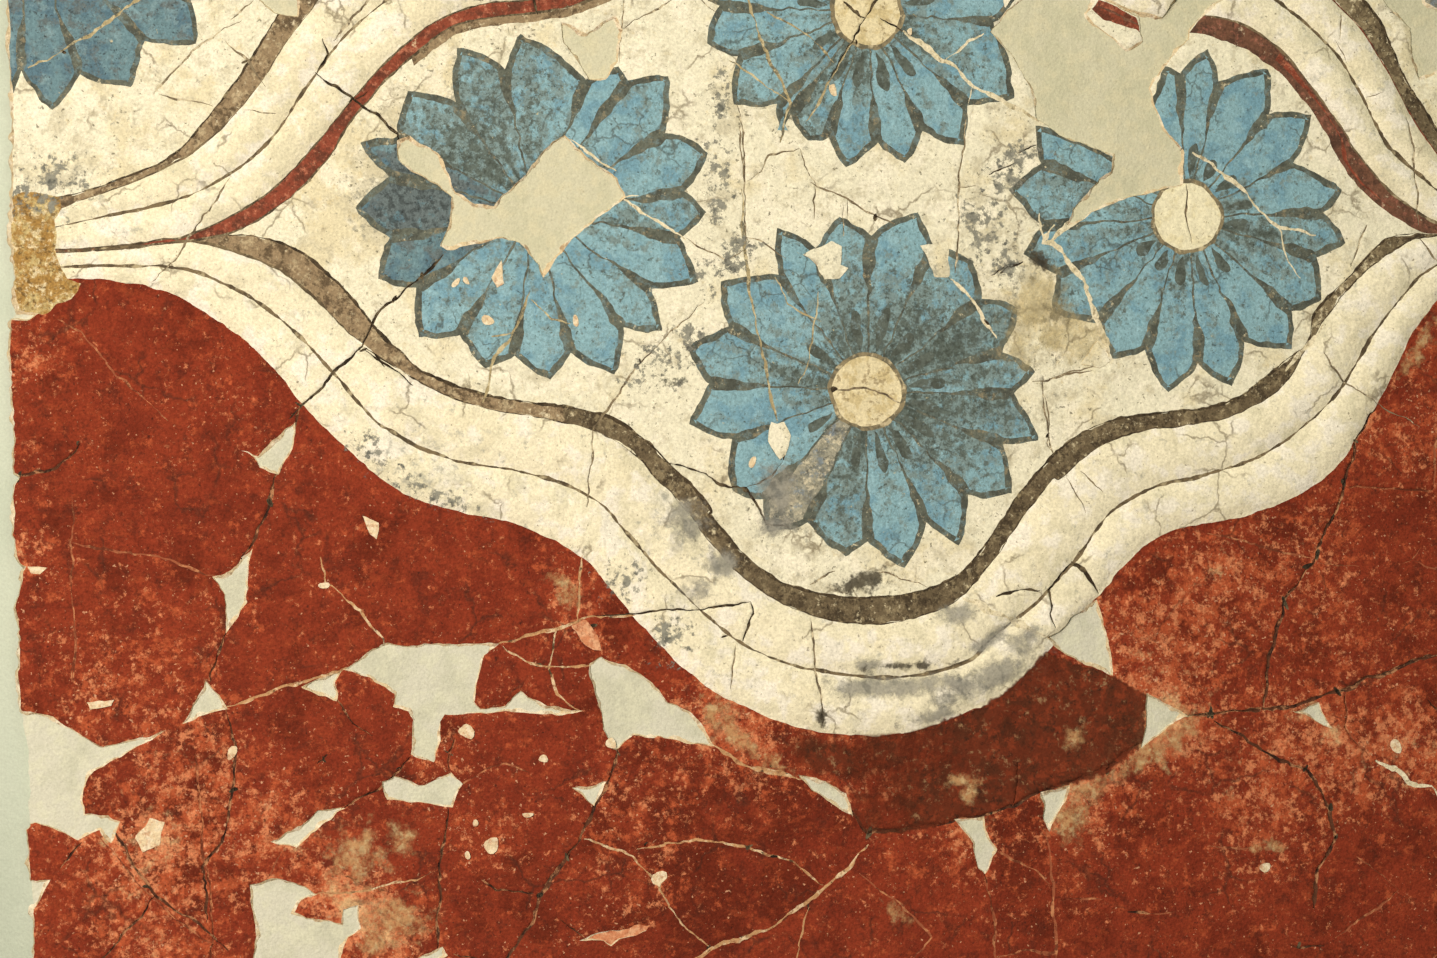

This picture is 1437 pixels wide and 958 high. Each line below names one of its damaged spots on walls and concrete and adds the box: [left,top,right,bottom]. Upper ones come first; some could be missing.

crack [315,0,399,140]
flaking render [990,0,1222,225]
crack [289,254,444,433]
flaking render [397,135,626,277]
crack [570,0,1110,513]
flaking render [5,0,166,958]
flaking render [302,643,581,807]
crack [498,558,754,710]
flaking render [572,619,853,816]
crack [996,561,1099,628]
crack [1186,324,1437,949]
flaking render [250,878,426,958]